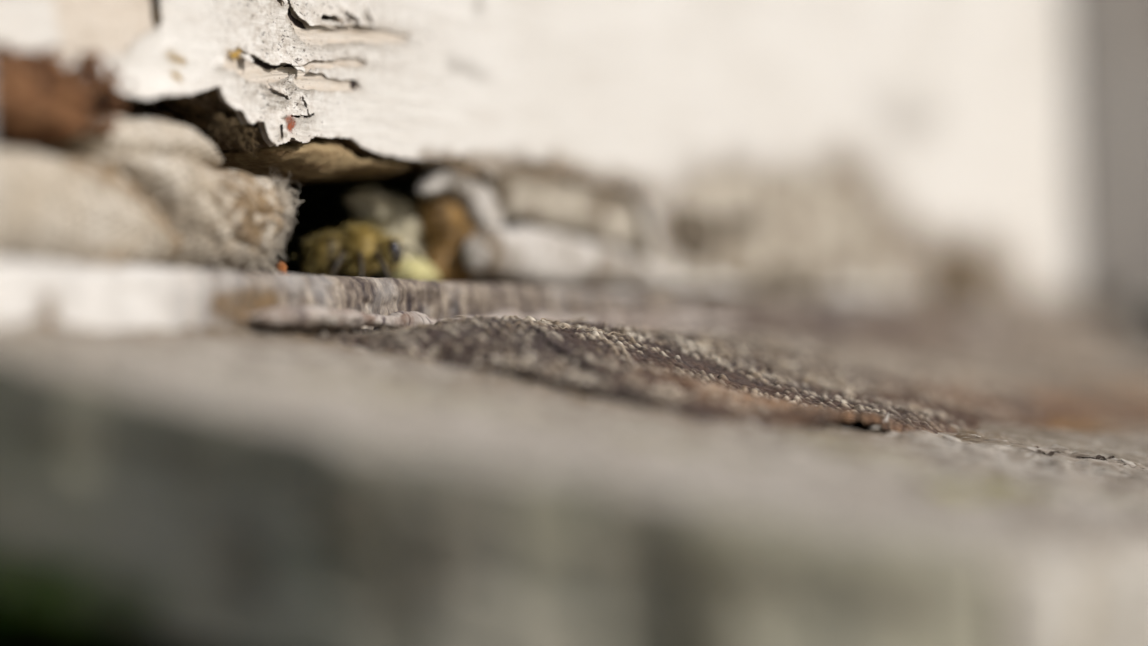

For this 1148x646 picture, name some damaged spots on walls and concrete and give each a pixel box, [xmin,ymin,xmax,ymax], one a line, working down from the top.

peeling [54,0,158,62]
peeling [279,0,408,45]
peeling [223,48,365,101]